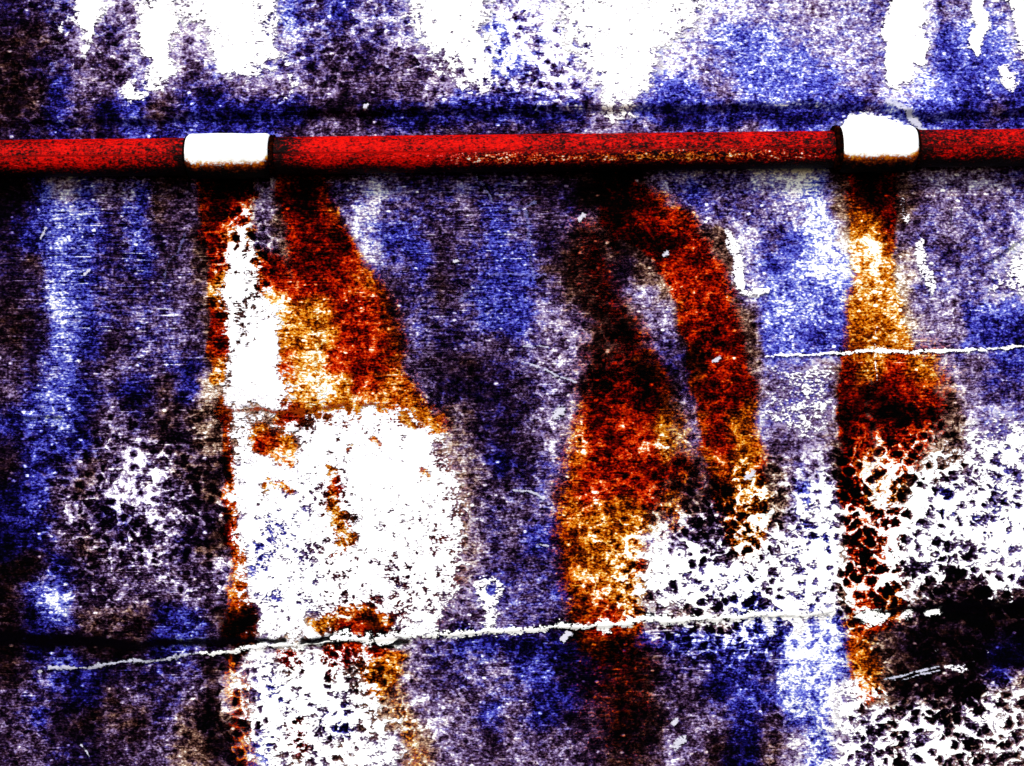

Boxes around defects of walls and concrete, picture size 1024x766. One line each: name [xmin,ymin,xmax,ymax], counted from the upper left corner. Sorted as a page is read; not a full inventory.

crack [0,629,410,652]
rust [196,174,467,766]
peeling [206,204,481,766]
rust [550,170,774,747]
peeling [621,360,1024,637]
crack [765,326,1024,369]
rust [836,172,956,705]